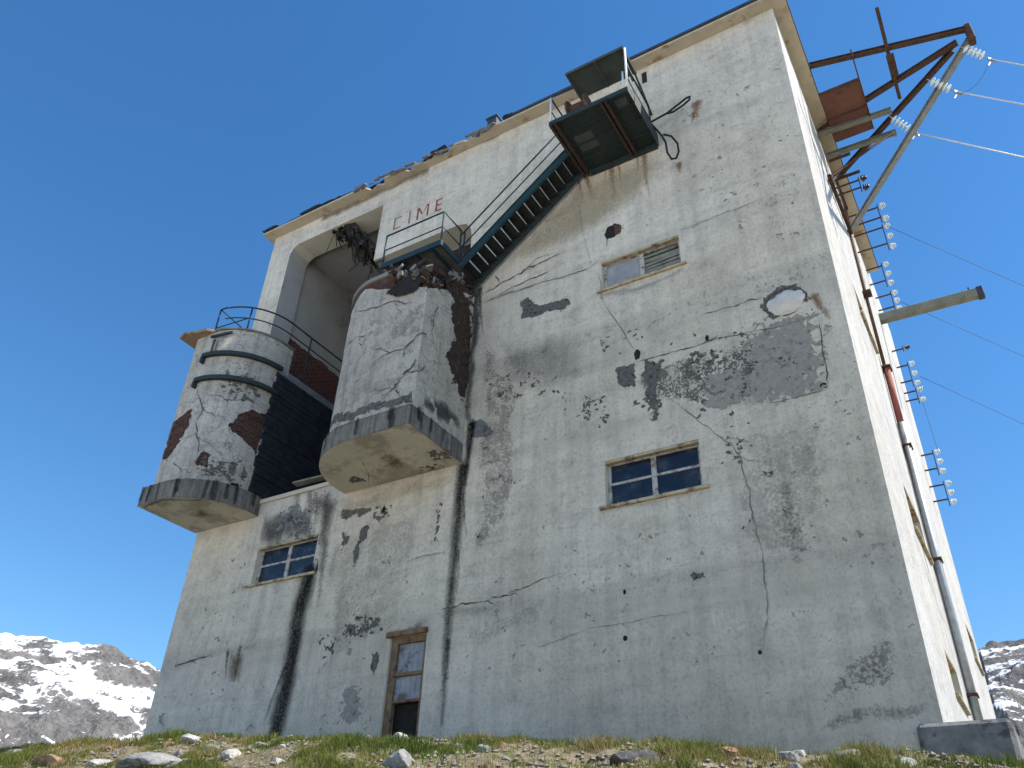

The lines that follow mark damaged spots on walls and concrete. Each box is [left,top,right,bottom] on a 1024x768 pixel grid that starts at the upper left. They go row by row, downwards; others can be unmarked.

spalling [163,410,192,459]
crack [173,389,254,477]
crack [348,301,443,399]
spalling [442,273,474,409]
peeling [520,297,570,319]
peeling [600,329,665,421]
crack [488,182,828,403]
peeling [684,283,832,464]
damp [262,496,334,737]
damp [418,400,475,671]
crack [442,572,565,610]
crack [665,393,769,650]